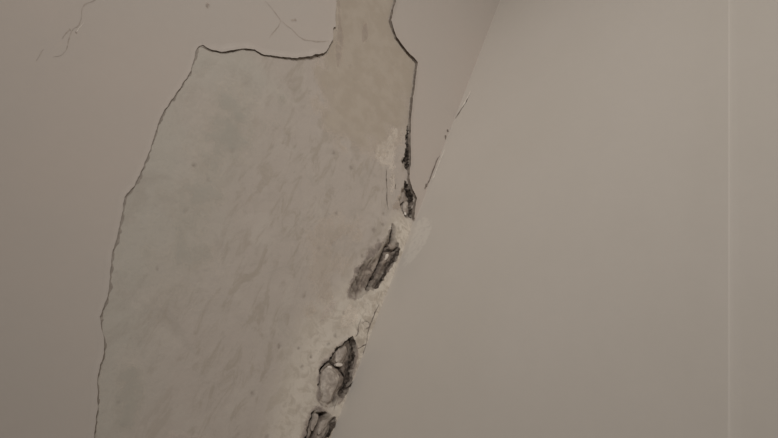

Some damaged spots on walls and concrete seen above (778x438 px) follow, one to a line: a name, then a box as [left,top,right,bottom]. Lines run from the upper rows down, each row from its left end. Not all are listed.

spalling [87,0,420,438]
crack [424,91,471,189]